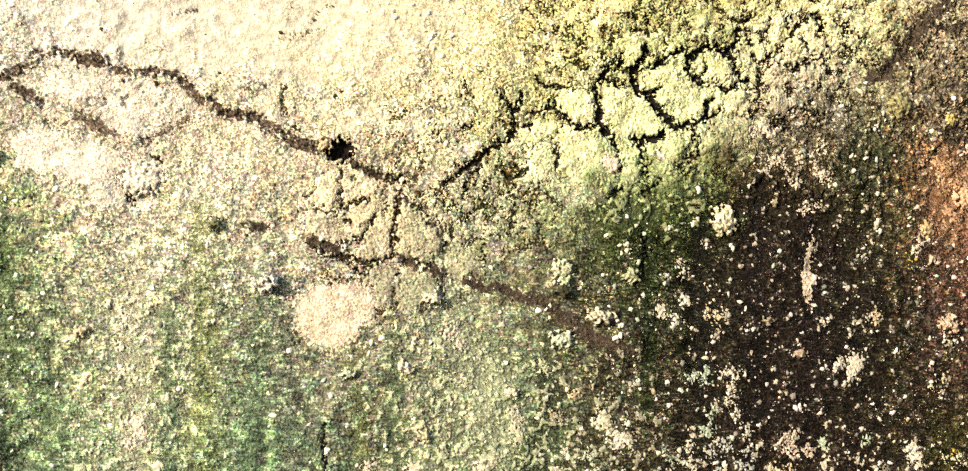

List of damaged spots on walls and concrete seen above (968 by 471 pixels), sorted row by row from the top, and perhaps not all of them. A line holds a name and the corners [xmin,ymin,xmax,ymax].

crack [279,3,334,41]
crack [117,173,137,211]
leakage [103,236,167,471]
crack [0,47,322,164]
leakage [238,219,276,234]
leakage [273,300,306,471]
leakage [306,234,351,263]
leakage [393,250,447,278]
leakage [426,295,567,471]
crack [300,0,823,316]
leakage [577,343,613,471]
leakage [626,142,922,471]